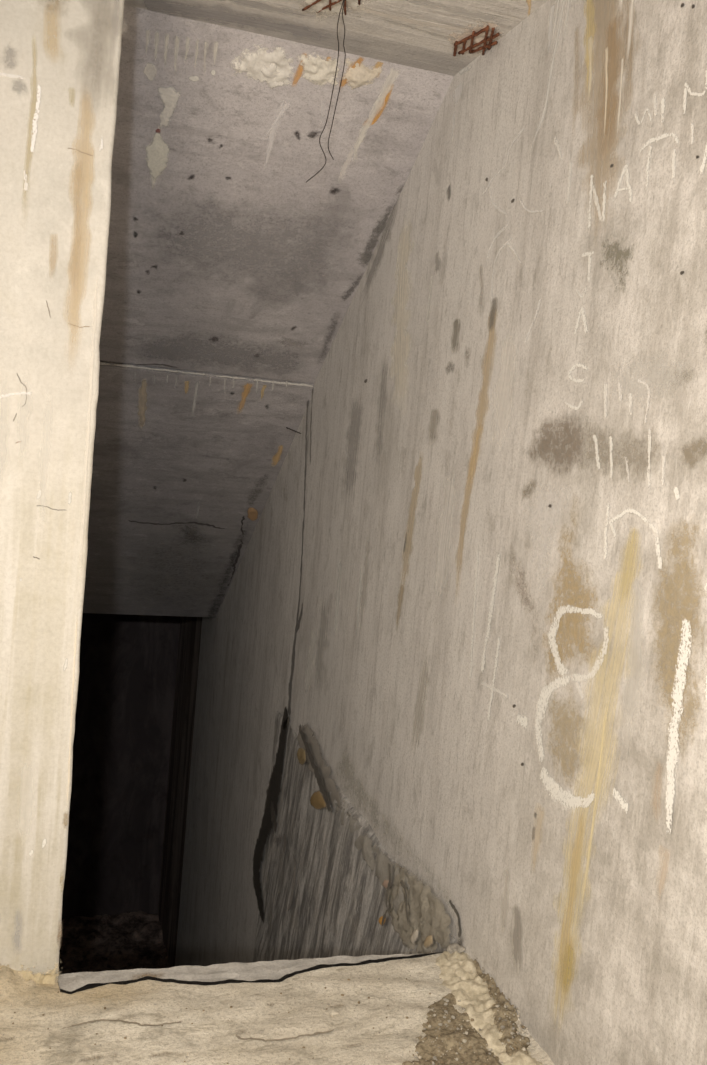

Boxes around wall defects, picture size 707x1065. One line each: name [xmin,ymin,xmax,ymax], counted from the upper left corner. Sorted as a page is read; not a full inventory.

corrosion [69,96,93,333]
water stain [144,33,217,187]
water stain [232,44,397,172]
corrosion [458,299,496,560]
crack [253,389,332,922]
spalling [297,724,462,954]
crack [382,864,408,926]
crack [449,900,461,937]